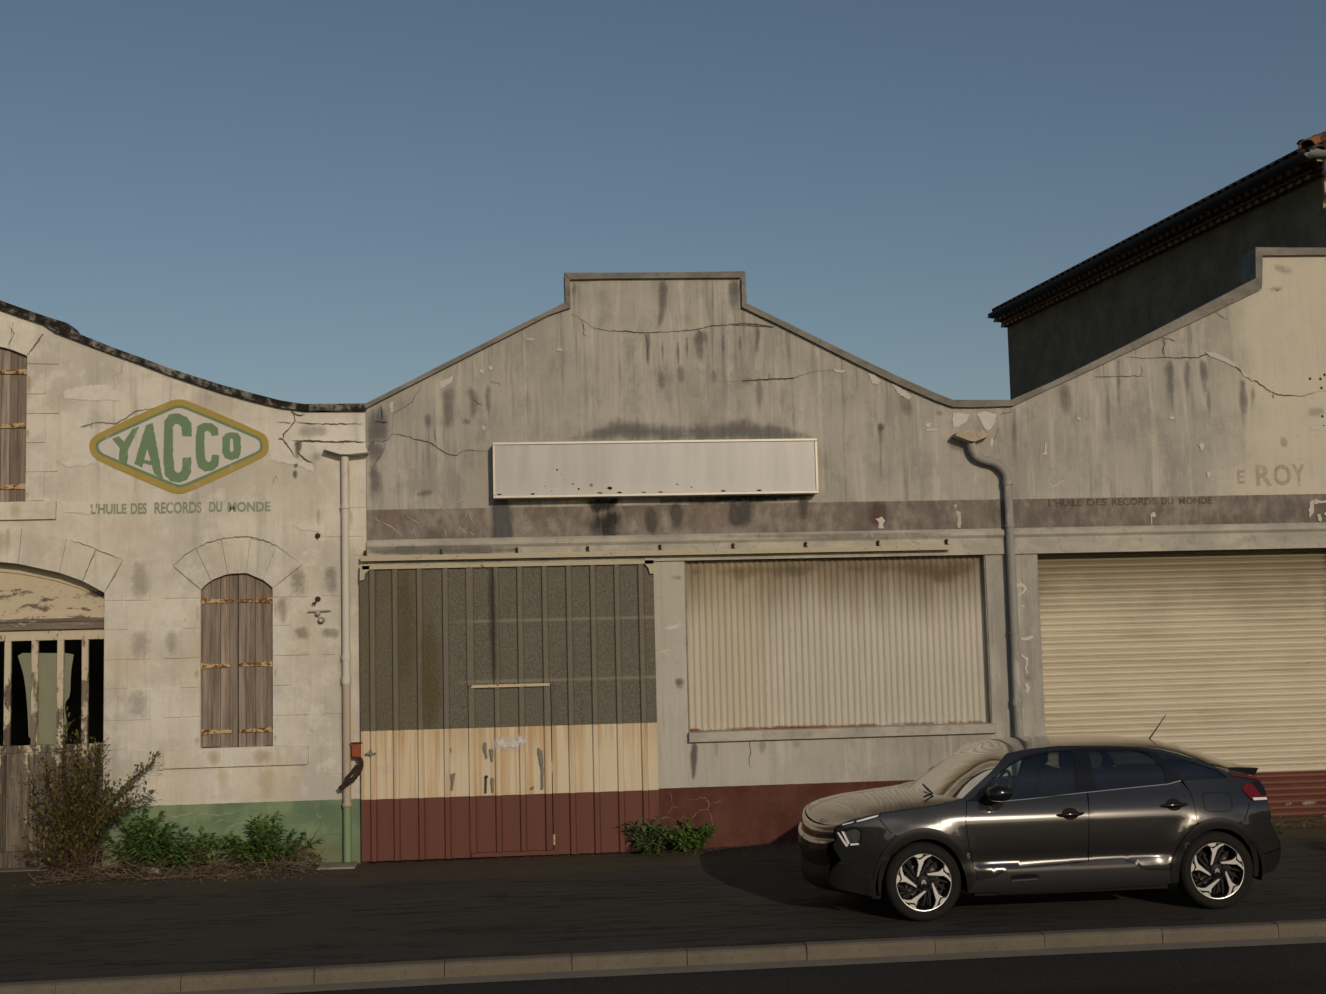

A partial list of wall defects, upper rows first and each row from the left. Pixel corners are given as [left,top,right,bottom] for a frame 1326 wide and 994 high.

crack [571,314,774,358]
crack [734,370,834,382]
crack [1095,337,1326,398]
crack [272,385,480,485]
water stain [369,412,385,489]
water stain [594,421,795,439]
peeling [952,411,996,446]
water stain [375,500,514,554]
water stain [588,498,617,536]
water stain [647,495,809,531]
peeling [1308,499,1326,522]
peeling [531,747,544,789]